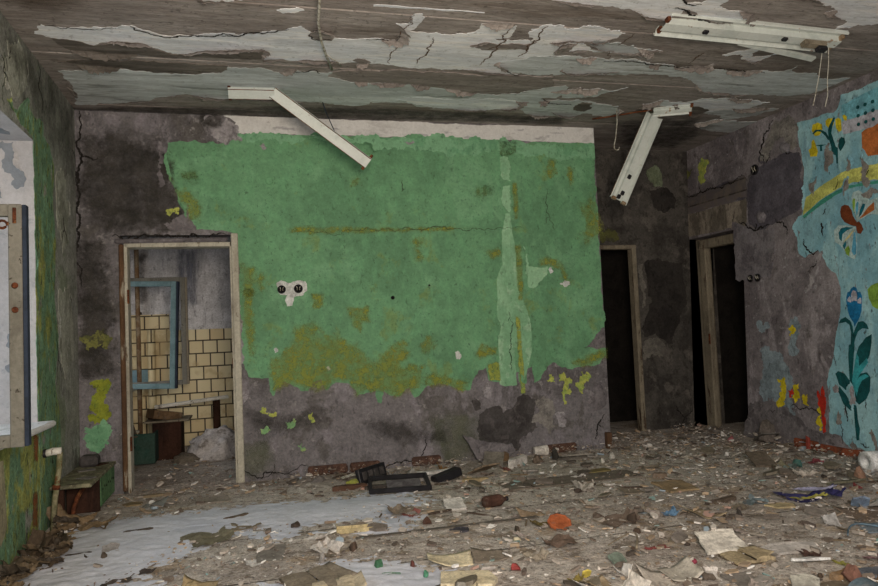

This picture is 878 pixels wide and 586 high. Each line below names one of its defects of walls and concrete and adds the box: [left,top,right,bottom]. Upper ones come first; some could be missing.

crack [1,50,11,102]
crack [480,26,548,65]
peeling [809,0,878,29]
peeling [0,128,26,198]
crack [61,111,98,286]
water stain [76,135,182,236]
water stain [73,107,296,127]
water stain [310,108,561,124]
peeling [34,0,849,282]
water stain [76,241,116,379]
peeling [270,326,466,396]
spalling [471,317,567,451]